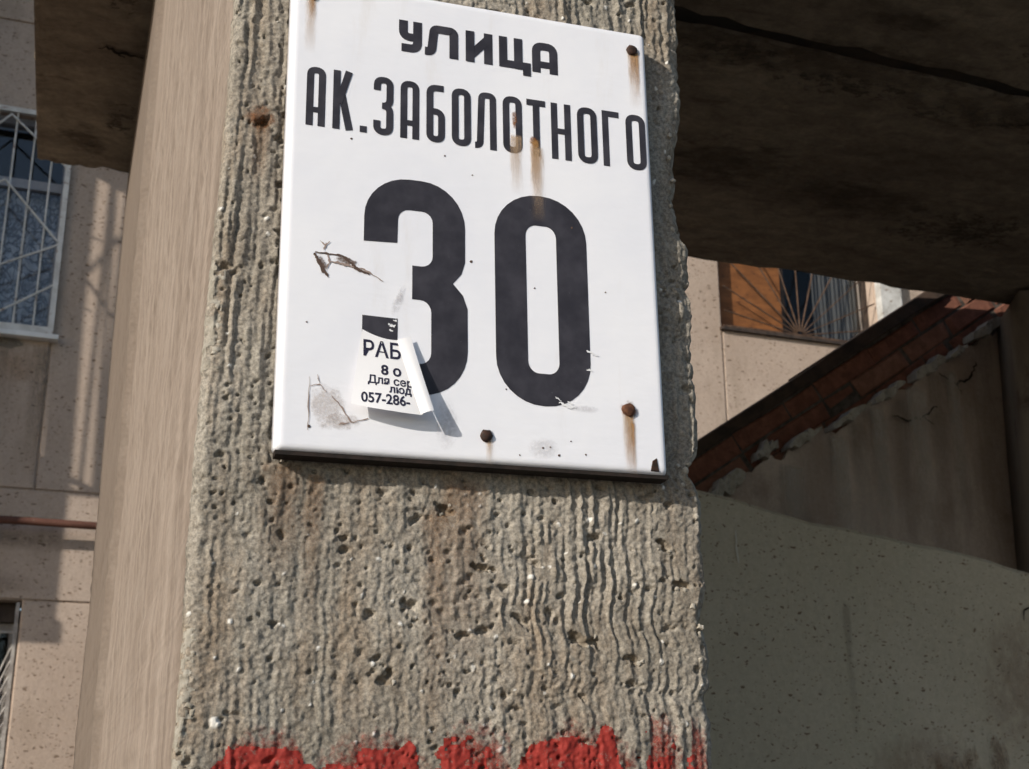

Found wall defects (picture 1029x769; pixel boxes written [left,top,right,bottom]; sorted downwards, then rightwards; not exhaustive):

rust [511,112,541,179]
rust [624,403,636,445]
spalling [674,316,1001,522]